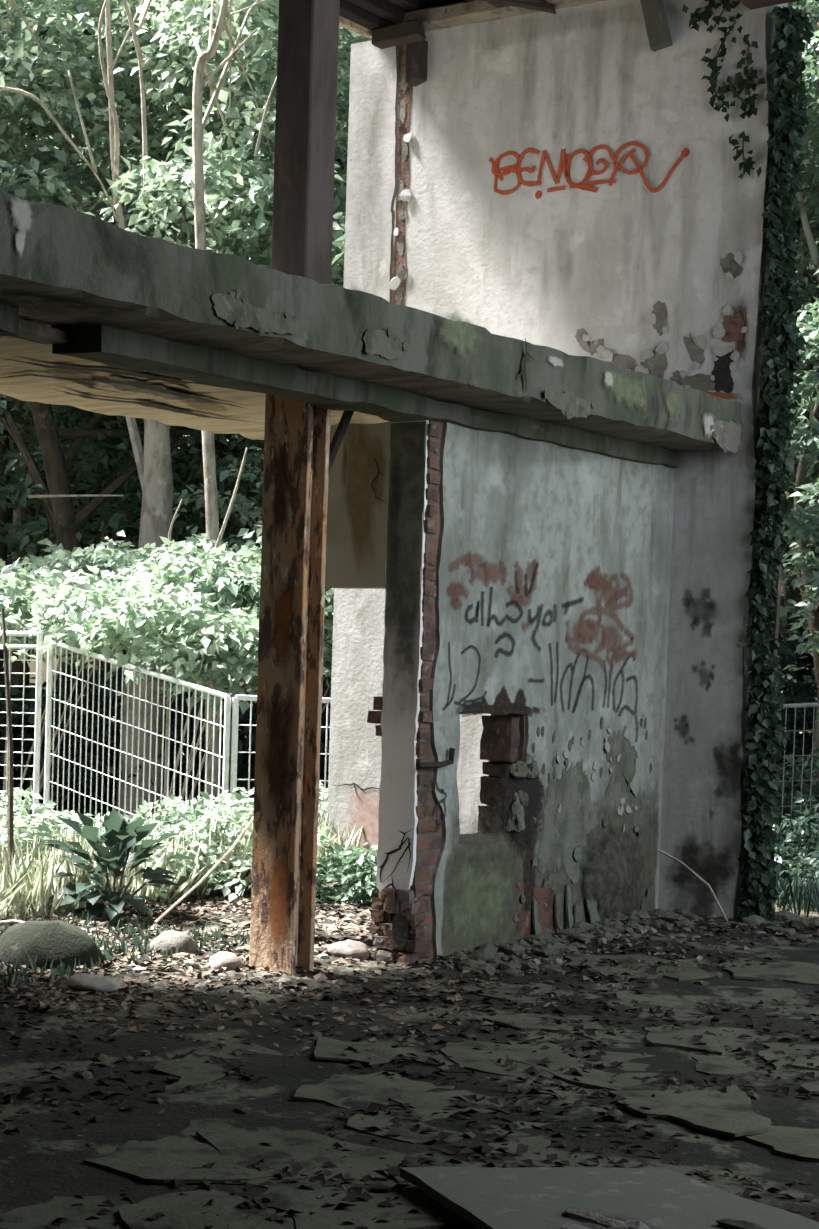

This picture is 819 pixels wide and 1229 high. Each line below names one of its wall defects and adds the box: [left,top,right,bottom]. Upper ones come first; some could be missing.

flaking render [720,251,743,281]
spalling [575,300,747,393]
flaking render [415,423,441,833]
flaking render [459,715,653,938]
spalling [369,883,433,966]